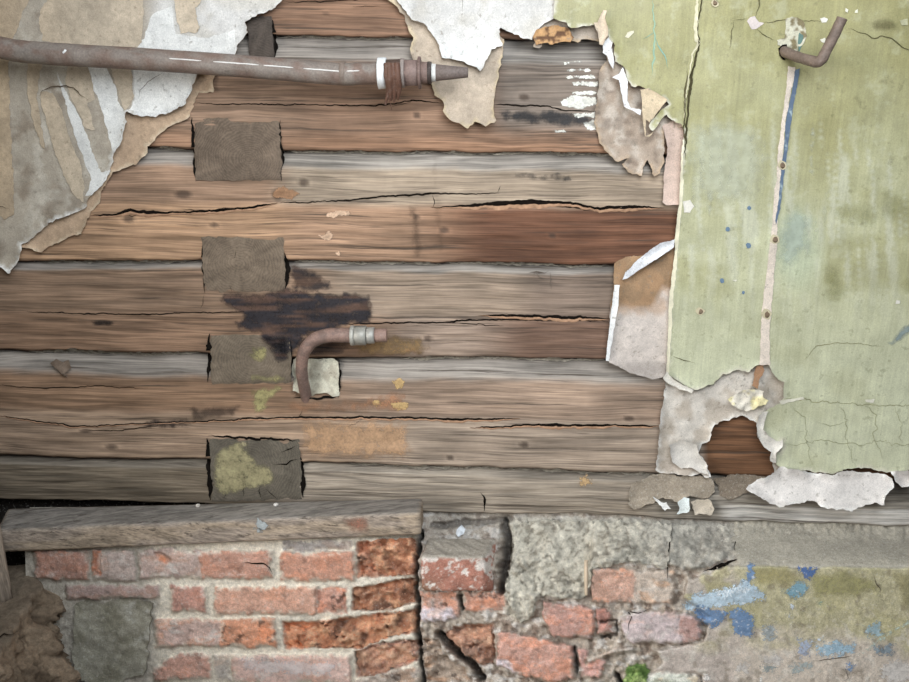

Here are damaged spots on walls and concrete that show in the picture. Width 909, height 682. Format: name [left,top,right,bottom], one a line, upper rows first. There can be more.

peeling [13,0,48,42]
peeling [138,0,282,54]
crack [682,0,702,159]
peeling [0,61,197,274]
crack [91,188,660,218]
peeling [397,0,909,512]
crack [787,398,909,463]
spalling [295,537,420,676]